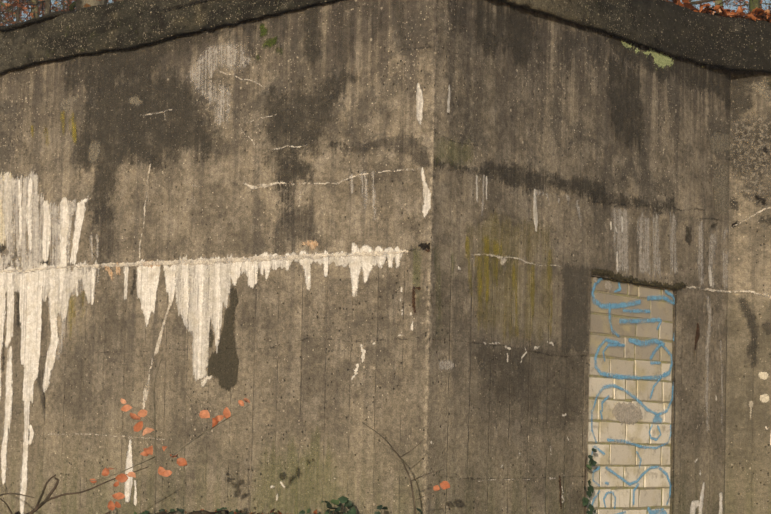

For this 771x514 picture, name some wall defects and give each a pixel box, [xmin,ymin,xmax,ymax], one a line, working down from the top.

leakage [453,0,544,65]
leakage [590,31,771,150]
leakage [0,0,402,514]